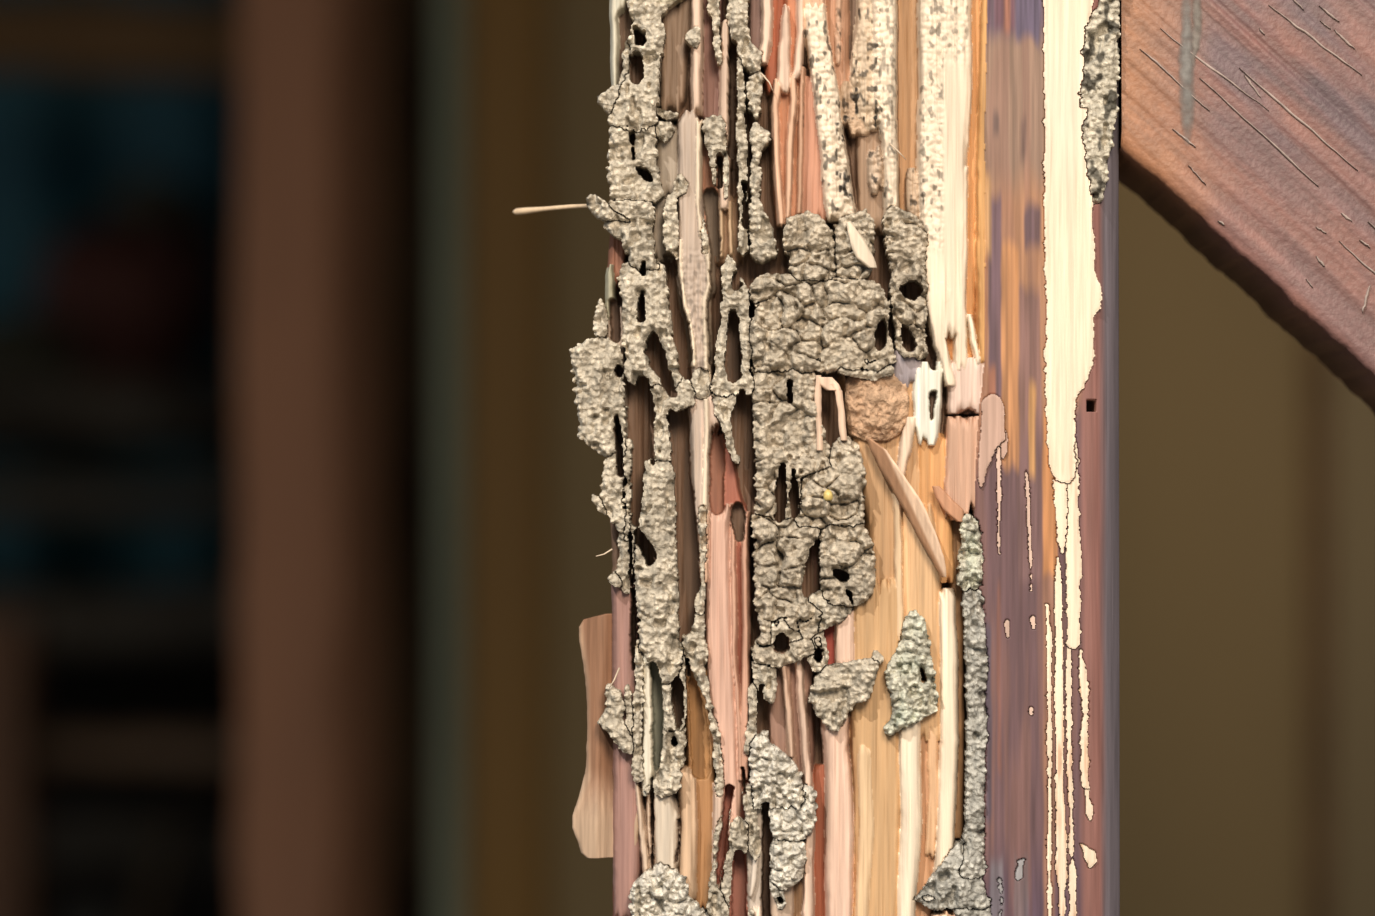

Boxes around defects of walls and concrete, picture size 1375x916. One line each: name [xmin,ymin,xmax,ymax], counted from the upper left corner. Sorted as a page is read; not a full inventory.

peeling [977,394,1008,487]
peeling [1042,0,1102,916]